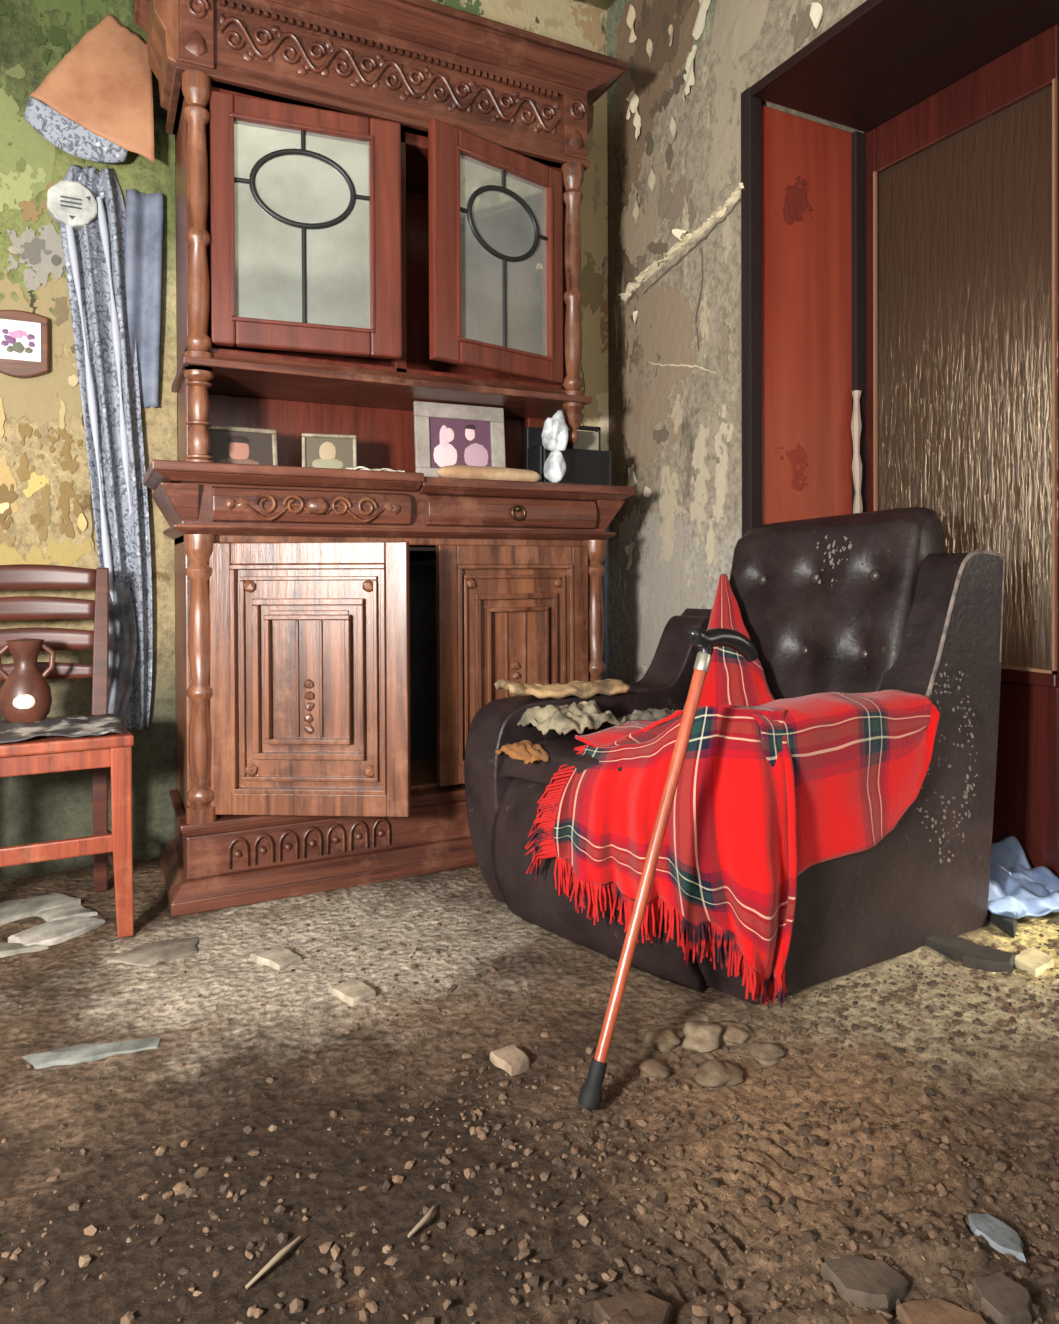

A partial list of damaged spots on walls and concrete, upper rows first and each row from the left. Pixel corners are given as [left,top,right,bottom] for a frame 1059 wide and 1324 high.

water stain [30,13,70,65]
flaking render [479,0,605,52]
flaking render [810,2,823,29]
water stain [0,64,56,213]
flaking render [577,0,711,451]
water stain [0,270,92,566]
peeling [23,468,49,498]
peeling [627,464,652,497]
peeling [77,513,87,531]